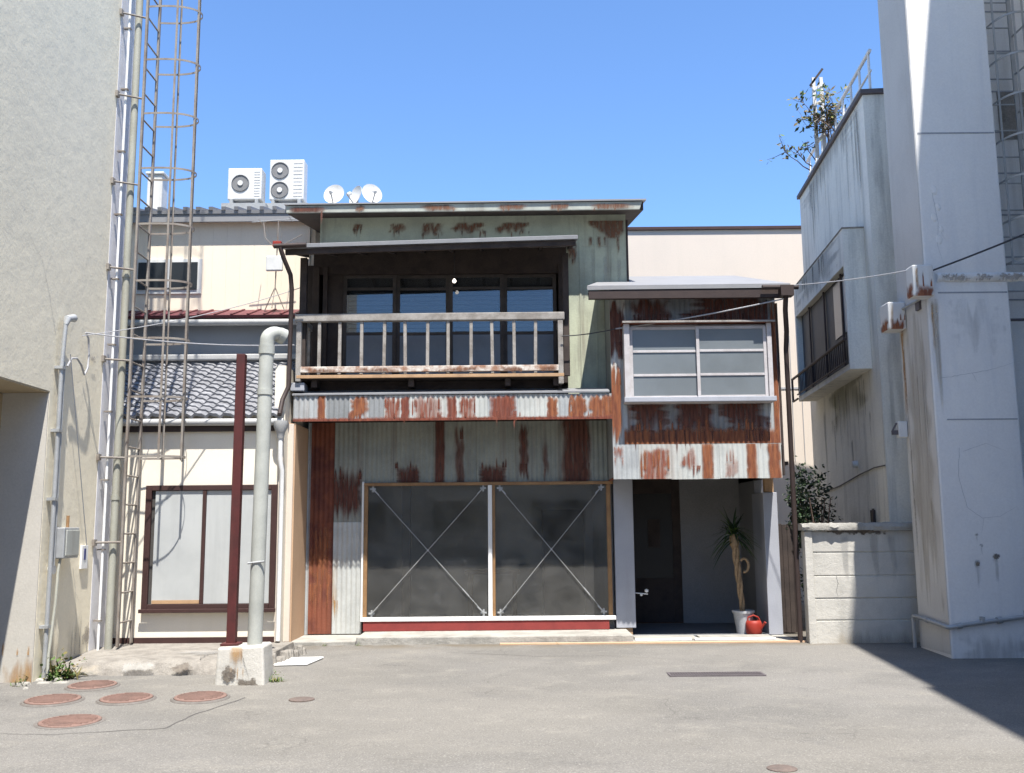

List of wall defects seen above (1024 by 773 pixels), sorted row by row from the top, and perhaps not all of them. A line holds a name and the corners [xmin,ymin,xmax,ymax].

corrosion [423,224,440,237]
corrosion [453,223,529,237]
corrosion [589,203,628,250]
corrosion [293,299,782,483]
corrosion [310,528,338,616]